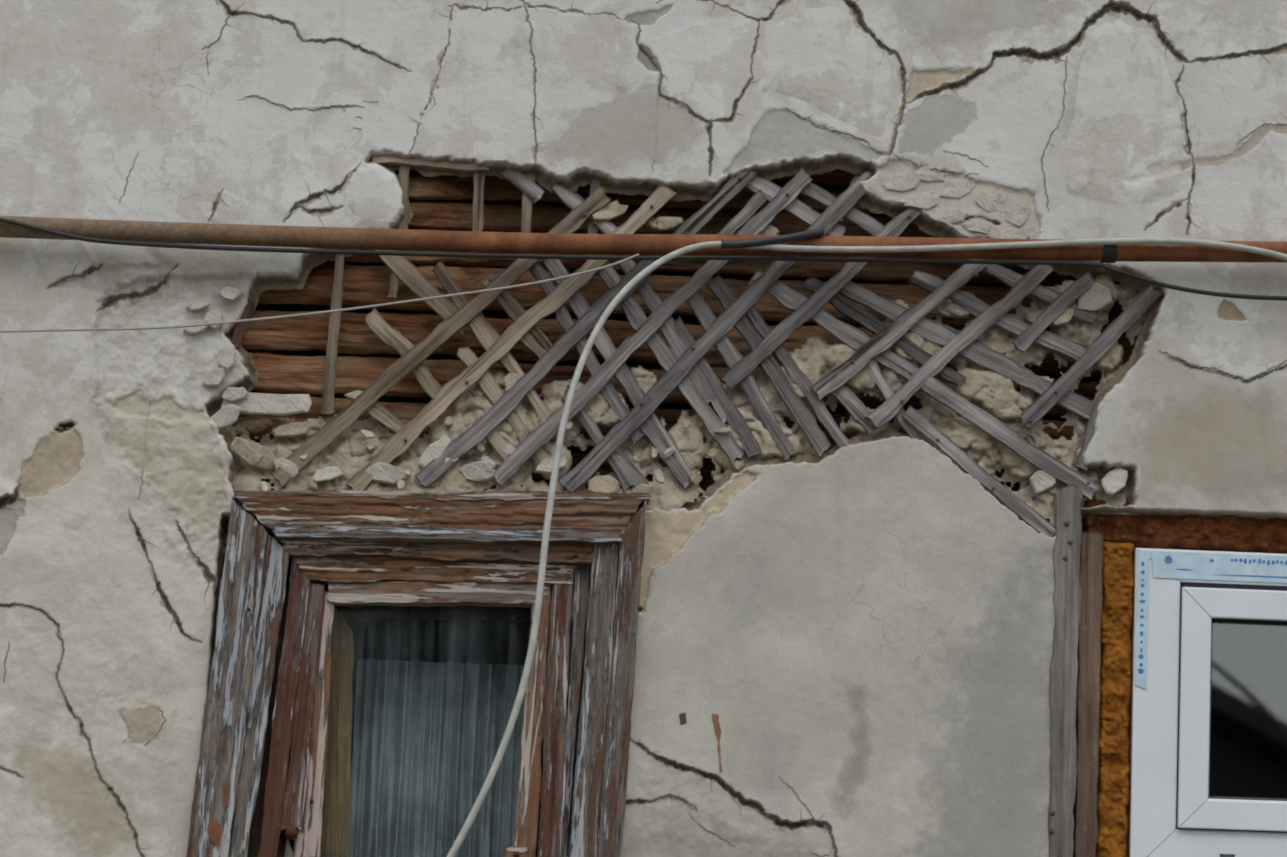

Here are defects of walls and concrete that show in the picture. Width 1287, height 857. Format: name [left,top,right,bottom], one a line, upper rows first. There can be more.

crack [202,0,1287,235]
crack [47,260,178,311]
spalling [592,200,629,221]
spalling [644,216,684,231]
spalling [977,274,1153,393]
crack [0,483,21,509]
peeling [0,422,83,554]
crack [128,466,218,643]
spalling [97,336,1067,612]
spalling [889,331,1142,515]
crack [0,603,144,857]
crack [626,738,838,857]